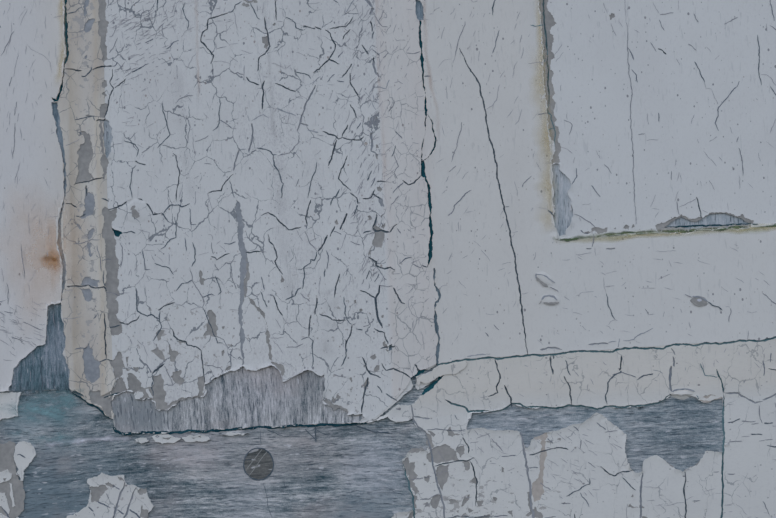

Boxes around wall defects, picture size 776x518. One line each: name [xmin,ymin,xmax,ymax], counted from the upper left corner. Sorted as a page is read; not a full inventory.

crack [0,7,85,390]
spalling [83,0,109,62]
spalling [75,80,122,336]
crack [65,0,427,396]
spalling [367,186,385,255]
crack [425,0,542,366]
peeling [539,0,573,236]
crack [562,115,612,184]
crack [588,0,776,224]
peeling [656,212,754,234]
peeling [0,200,724,518]